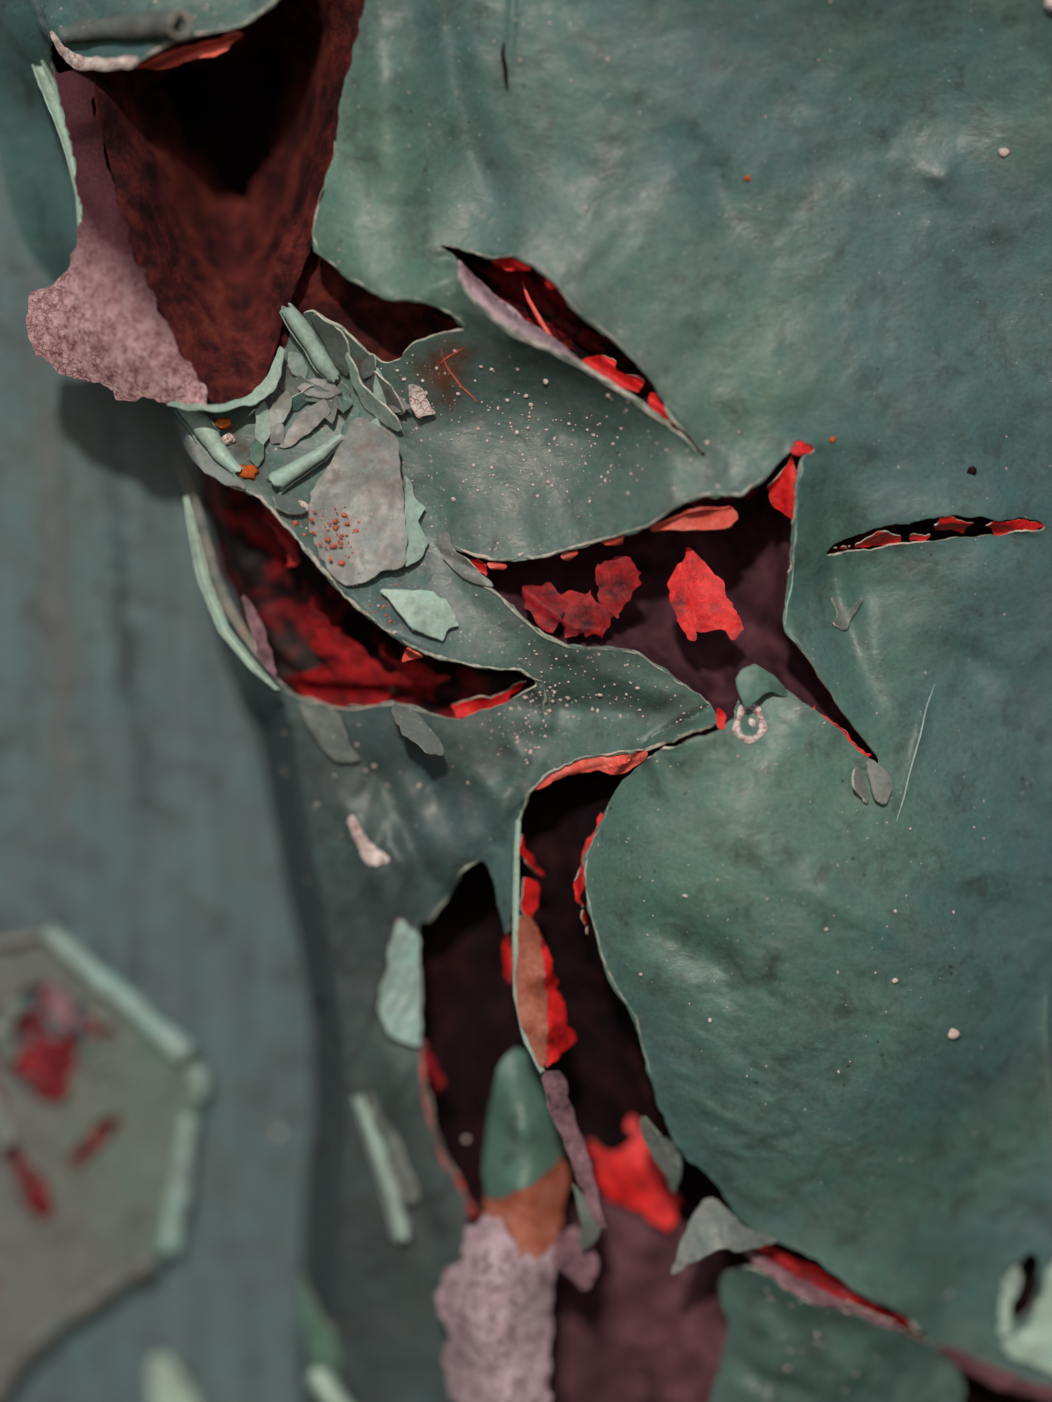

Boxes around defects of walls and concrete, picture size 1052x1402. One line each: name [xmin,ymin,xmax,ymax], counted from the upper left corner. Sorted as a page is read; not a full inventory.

spalling [92,0,365,448]
peeling [310,313,435,431]
spalling [422,302,463,331]
spalling [441,246,657,411]
spalling [173,418,535,719]
spalling [827,515,1043,554]
spalling [378,452,892,1228]
peeling [0,981,126,1102]
peeling [0,1089,55,1222]
spalling [721,1249,763,1272]
peeling [148,1353,197,1402]
peeling [956,1253,1052,1402]